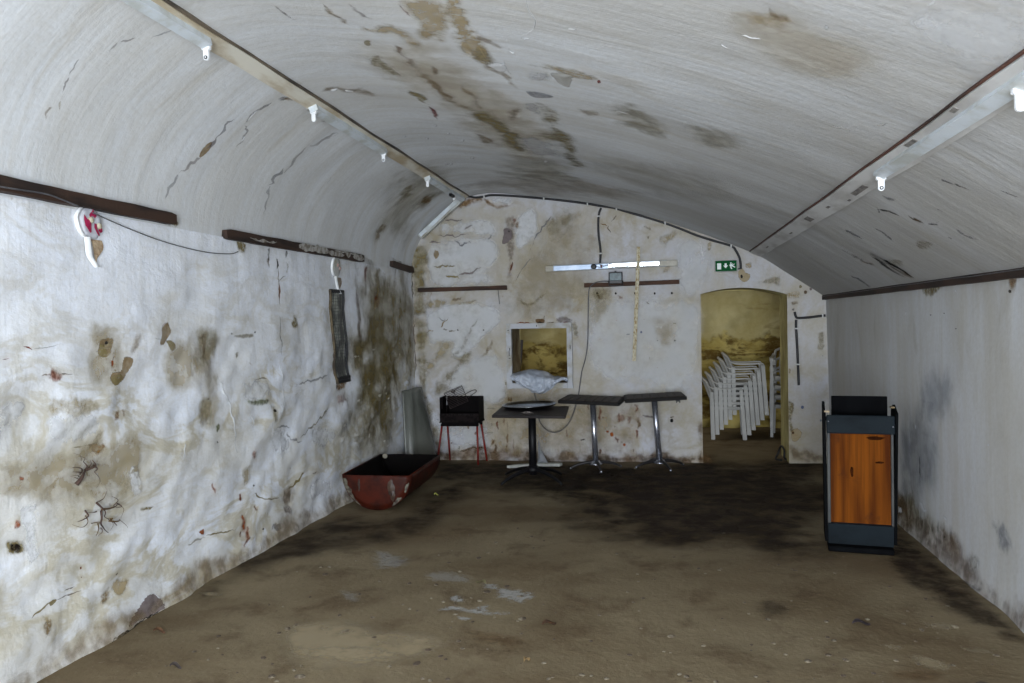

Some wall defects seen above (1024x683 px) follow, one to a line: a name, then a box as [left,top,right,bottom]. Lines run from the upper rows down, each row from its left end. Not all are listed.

damp [379,0,489,64]
damp [473,113,522,151]
damp [546,118,579,166]
spalling [502,228,512,244]
spalling [98,338,133,386]
spalling [156,323,176,351]
damp [346,247,471,440]
damp [894,497,1022,636]
spalling [112,593,165,643]